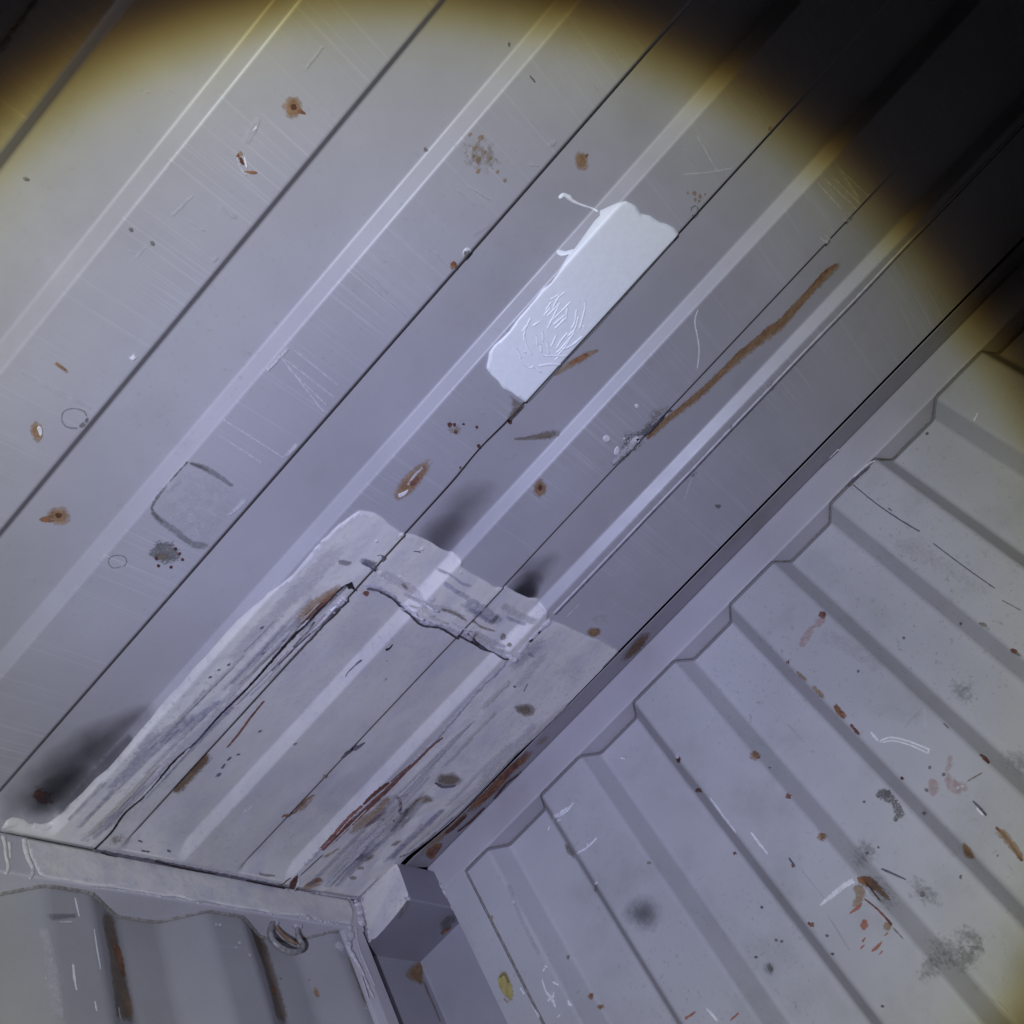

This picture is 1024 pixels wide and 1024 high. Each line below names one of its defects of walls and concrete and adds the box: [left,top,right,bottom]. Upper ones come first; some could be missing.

rust [283,98,305,117]
rust [576,154,588,169]
rust [647,264,838,439]
rust [31,422,42,441]
rust [534,481,546,496]
rust [40,508,68,524]
crack [94,563,509,889]
rust [425,752,532,859]
rust [996,827,1023,861]
rust [850,868,906,954]
rust [104,915,132,1019]